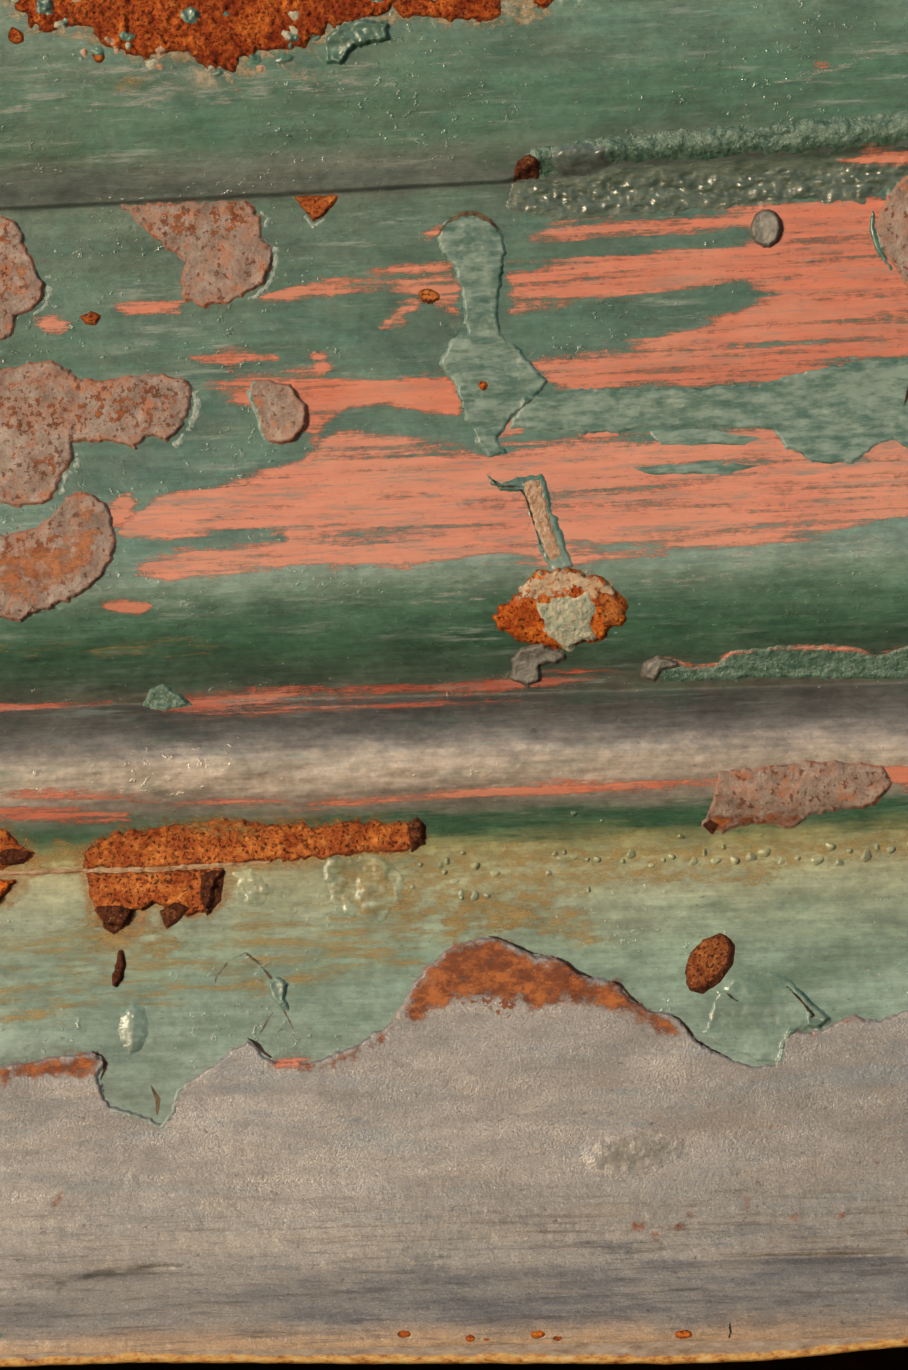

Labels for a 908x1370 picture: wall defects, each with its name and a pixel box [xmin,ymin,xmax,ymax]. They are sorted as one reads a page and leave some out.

rust [1,0,554,91]
peeling [35,315,71,334]
peeling [107,197,908,582]
peeling [102,599,153,614]
rust [492,567,629,651]
rust [0,817,906,1058]
rust [248,1038,311,1069]
peeling [0,937,908,1354]